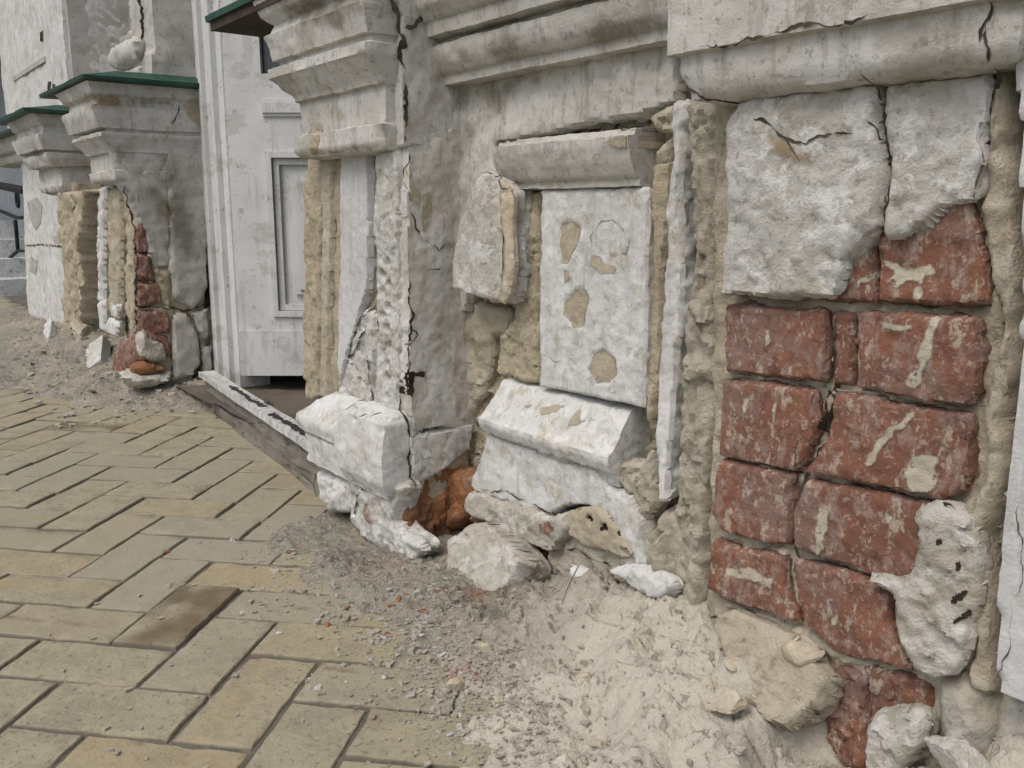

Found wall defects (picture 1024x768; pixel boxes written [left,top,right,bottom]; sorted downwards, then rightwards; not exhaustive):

crack [136,0,144,41]
crack [708,13,873,48]
crack [972,2,1002,201]
crack [690,74,893,238]
crack [123,186,210,376]
crack [345,0,445,490]
peeling [560,222,588,328]
peeling [590,255,616,274]
peeling [882,321,911,331]
peeling [913,286,923,302]
peeling [589,350,617,383]
spalling [445,466,477,531]